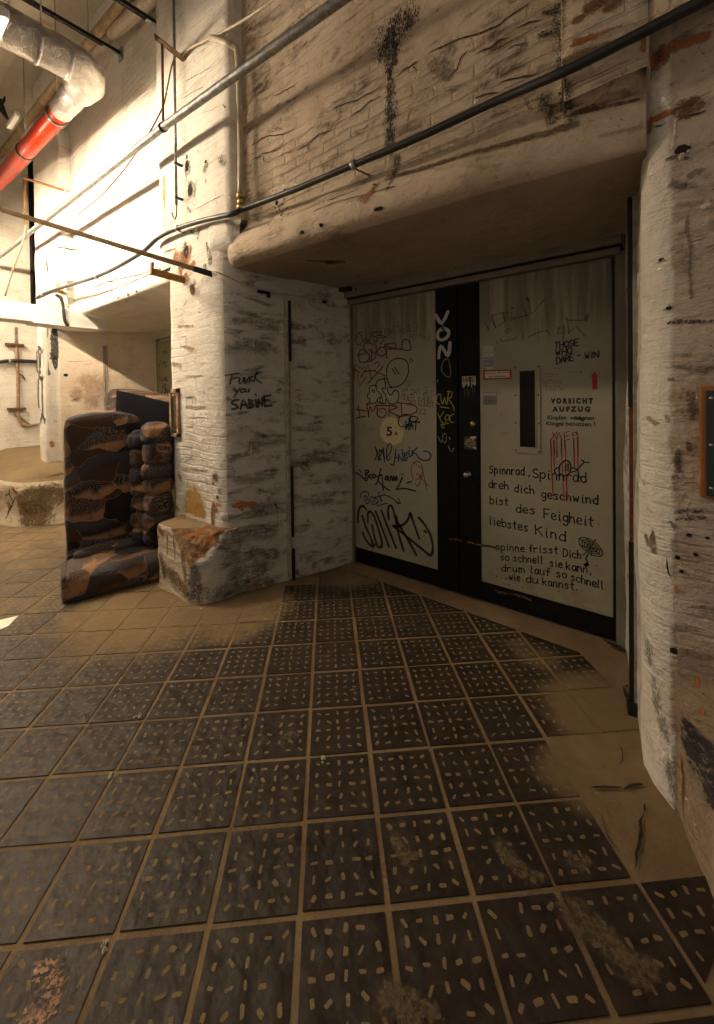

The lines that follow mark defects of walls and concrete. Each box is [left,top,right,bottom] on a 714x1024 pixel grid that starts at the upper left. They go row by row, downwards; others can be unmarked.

crack [250,1,542,162]
water stain [372,0,423,191]
mould [535,0,577,126]
rust [640,31,711,69]
rust [164,247,195,295]
water stain [7,482,64,526]
spalling [171,527,233,568]